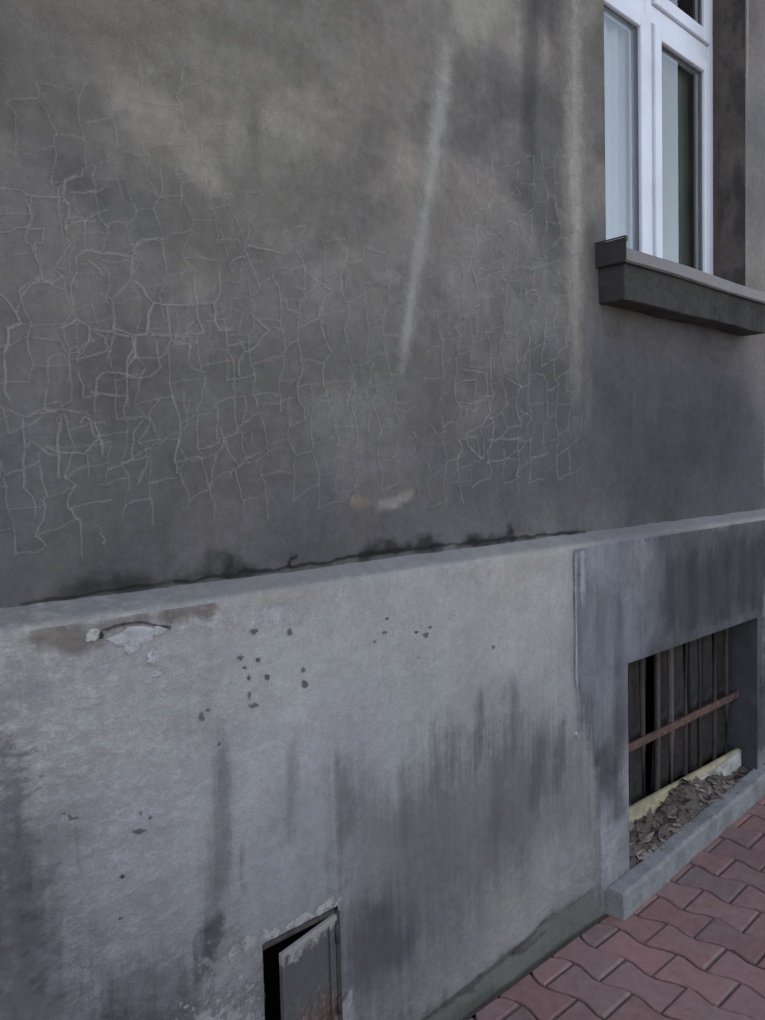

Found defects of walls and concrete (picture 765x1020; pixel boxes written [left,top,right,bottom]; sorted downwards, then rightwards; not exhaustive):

damp [468,527,515,547]
flaking render [85,626,168,678]
spalling [180,896,342,1020]
spalling [342,989,354,1020]